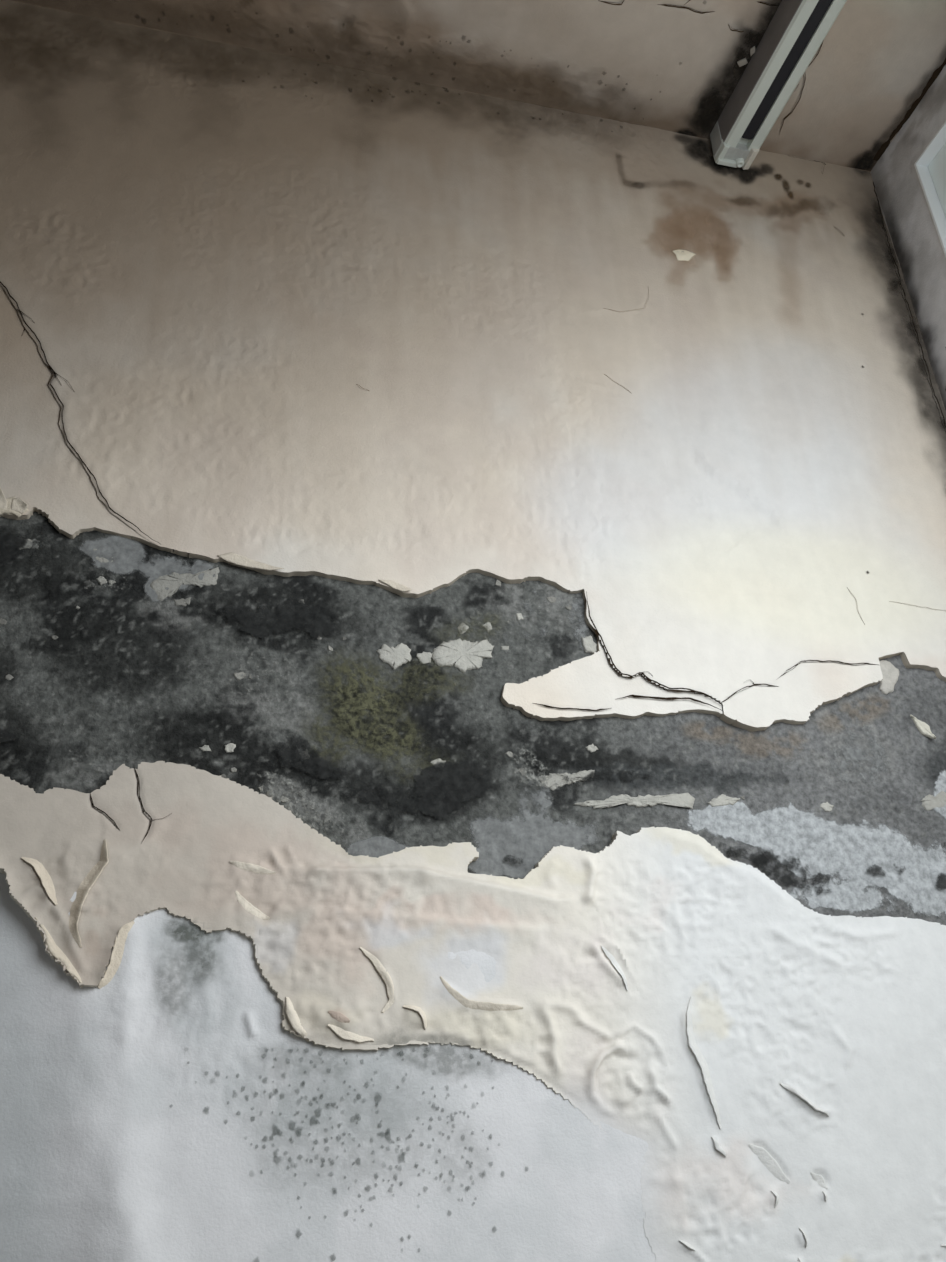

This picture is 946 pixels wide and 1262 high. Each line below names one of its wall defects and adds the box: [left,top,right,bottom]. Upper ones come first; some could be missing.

crack [657,0,743,32]
mould [676,0,782,169]
mould [865,212,946,442]
crack [0,281,160,544]
crack [533,591,877,711]
crack [90,767,172,842]
damp [172,923,203,942]
flaking render [0,487,946,1262]
damp [264,1098,335,1141]